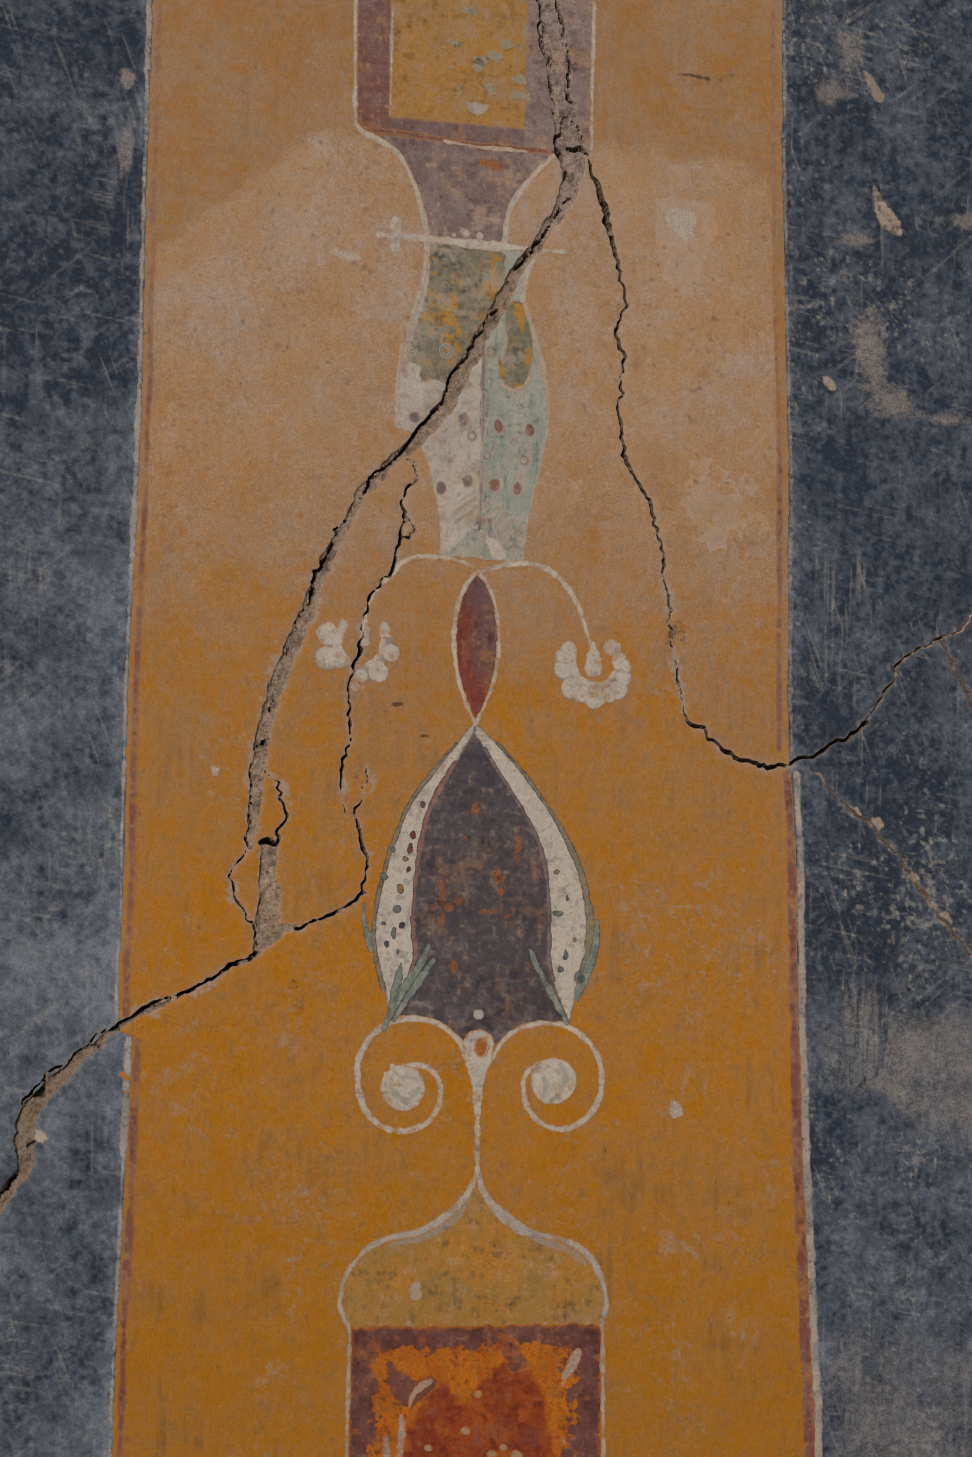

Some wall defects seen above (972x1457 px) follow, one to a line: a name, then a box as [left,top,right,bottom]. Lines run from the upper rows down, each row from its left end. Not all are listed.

crack [0,0,674,1214]
crack [675,611,972,959]